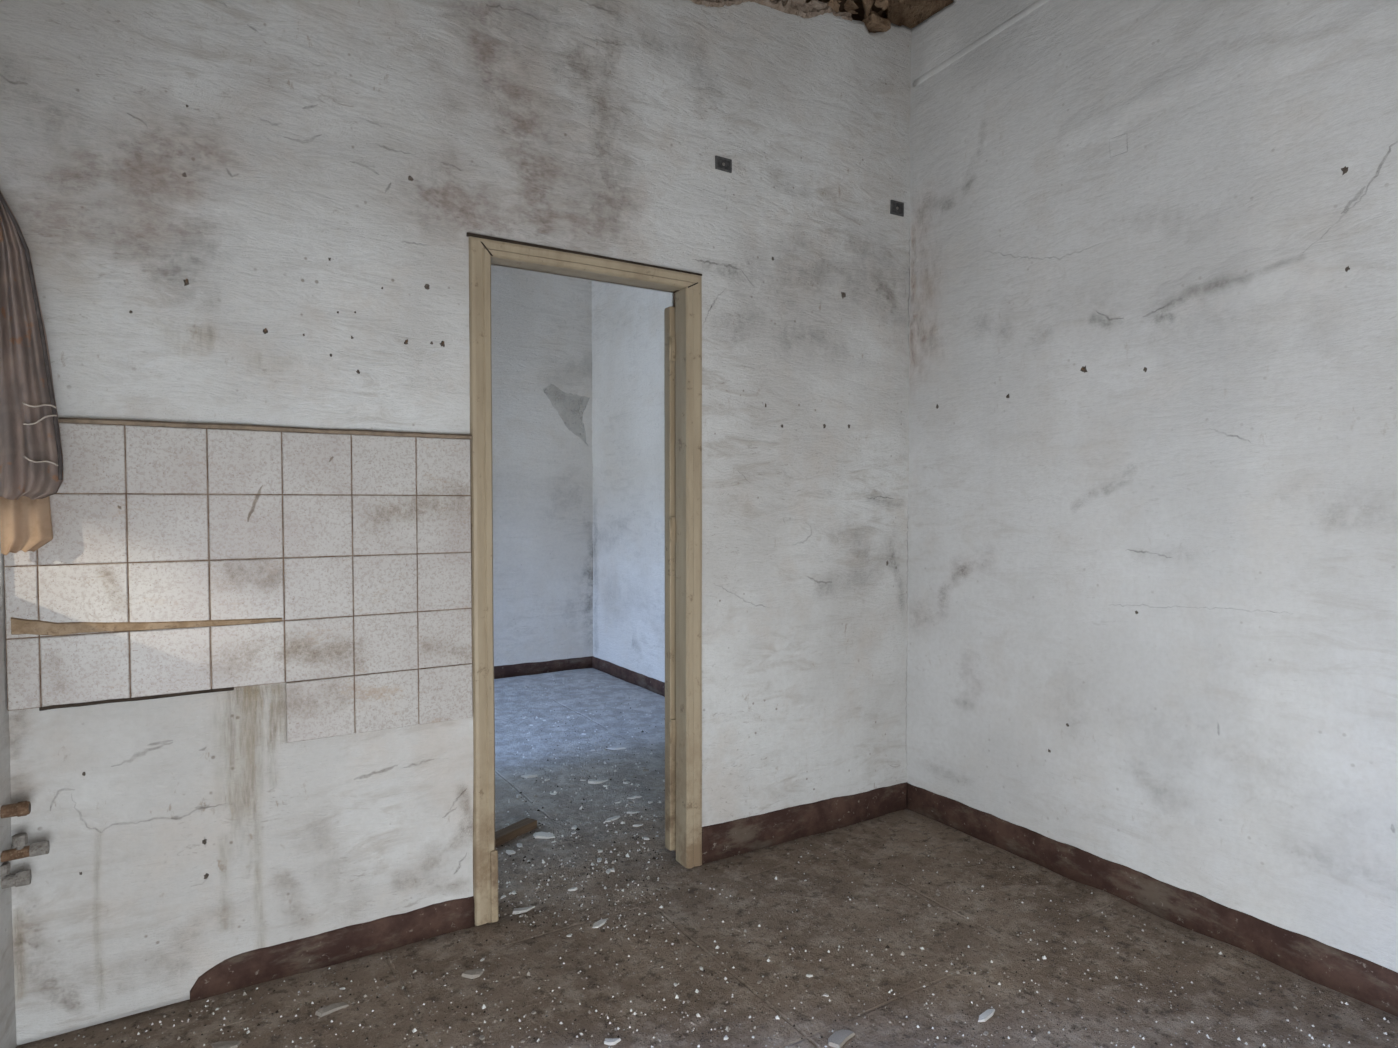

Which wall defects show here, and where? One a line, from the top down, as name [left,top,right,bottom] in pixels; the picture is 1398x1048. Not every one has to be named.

spalling [690,0,858,21]